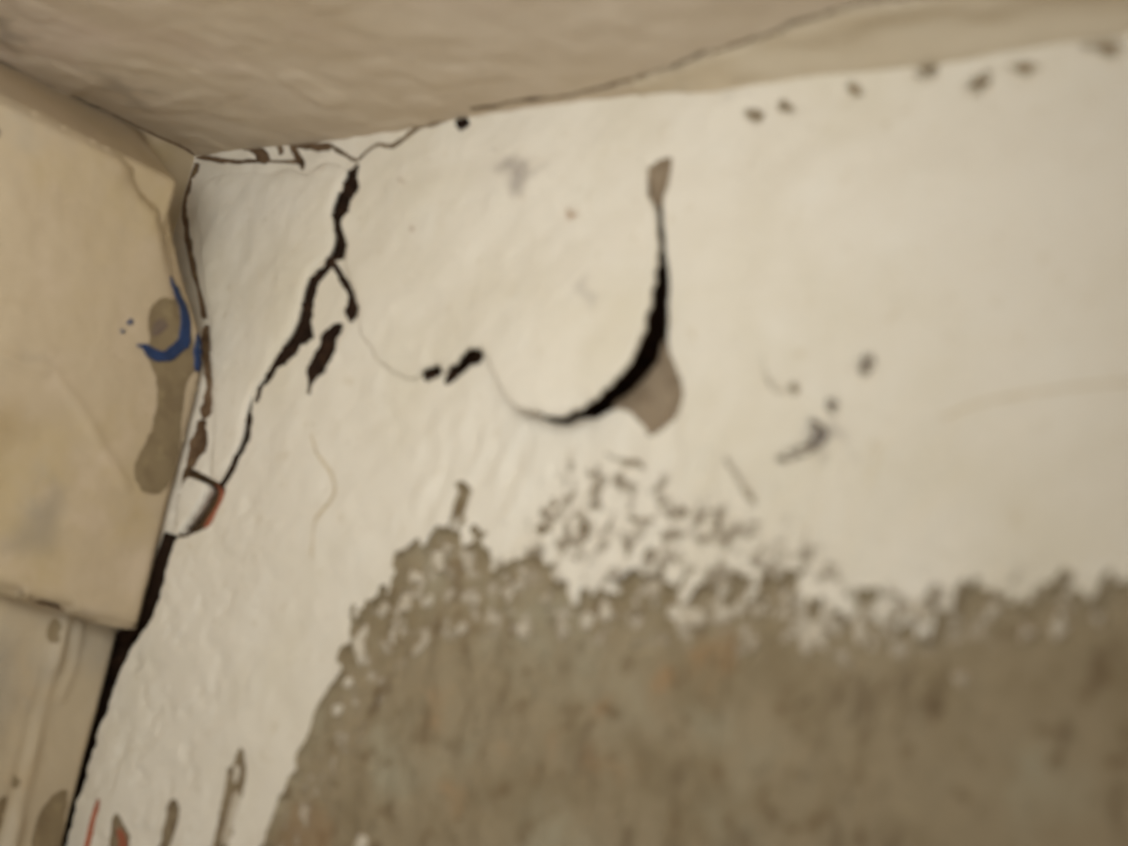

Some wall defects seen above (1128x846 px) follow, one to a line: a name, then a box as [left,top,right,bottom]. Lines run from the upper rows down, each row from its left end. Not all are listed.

crack [80,99,302,472]
crack [219,0,909,488]
crack [311,434,336,559]
crack [61,532,179,846]